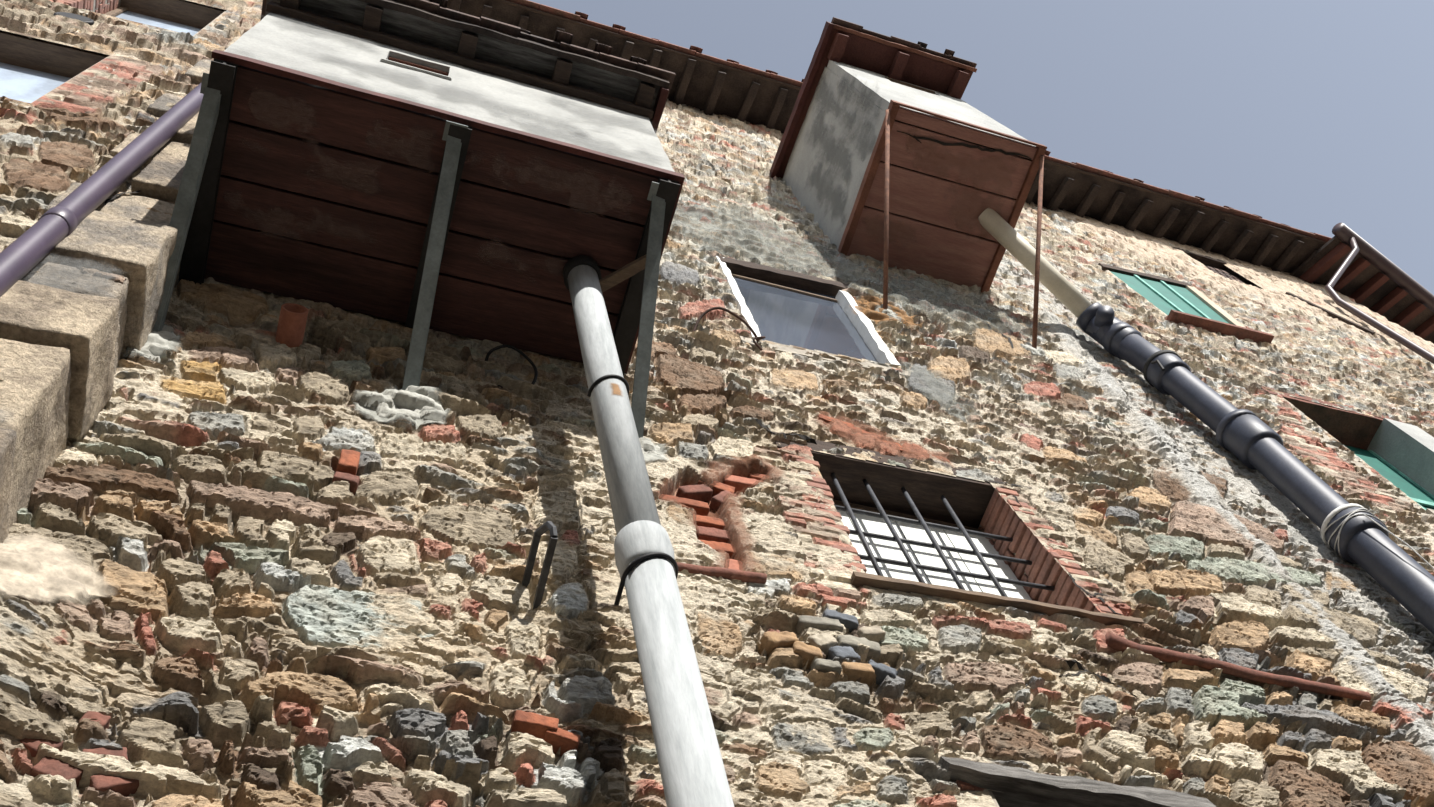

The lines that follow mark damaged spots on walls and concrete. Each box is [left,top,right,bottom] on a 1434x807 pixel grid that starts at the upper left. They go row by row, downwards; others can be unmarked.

crack [897,131,1031,159]
rust [854,296,920,326]